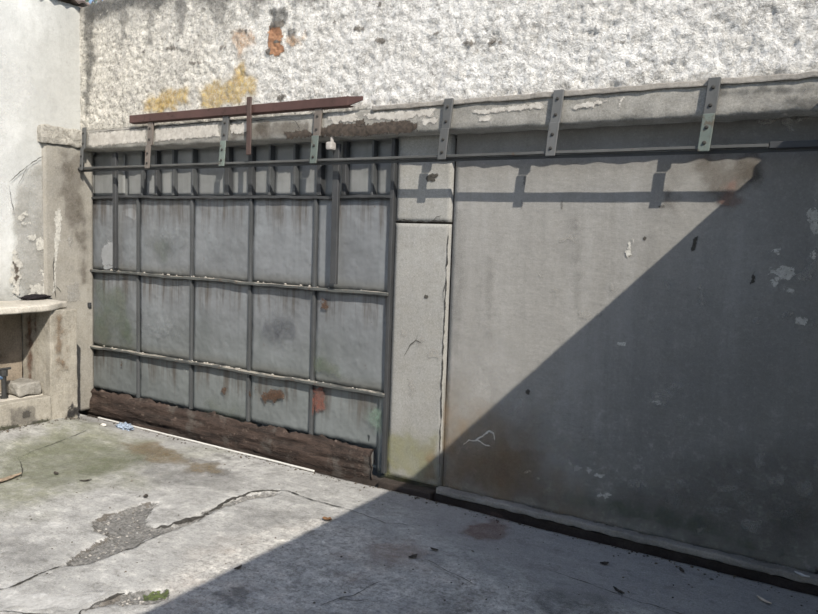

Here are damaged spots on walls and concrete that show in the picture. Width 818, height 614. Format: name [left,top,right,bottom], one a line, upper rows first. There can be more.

water stain [270,8,295,46]
water stain [83,0,164,106]
water stain [202,65,255,108]
peeling [767,243,817,294]
rust [246,387,285,403]
spalling [66,492,278,566]
crack [121,489,406,552]
crack [0,566,60,589]
crack [78,591,125,614]
crack [322,581,381,605]